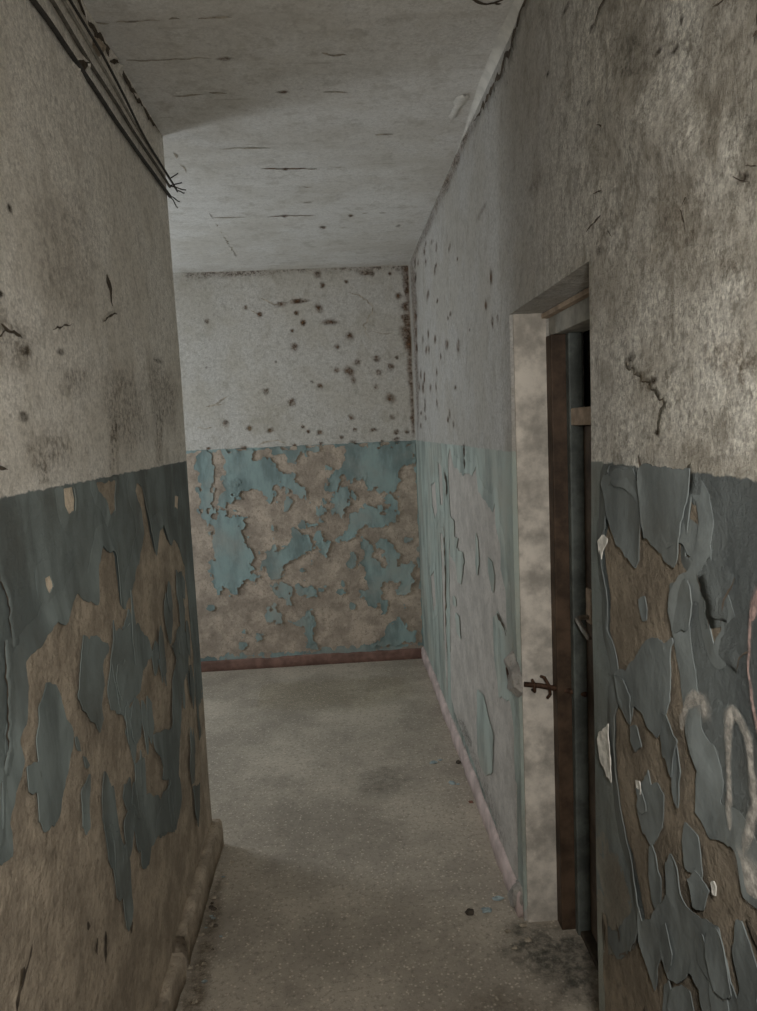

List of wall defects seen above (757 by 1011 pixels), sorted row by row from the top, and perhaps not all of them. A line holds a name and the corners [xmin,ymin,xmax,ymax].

crack [0,308,23,339]
crack [101,269,117,321]
peeling [0,441,422,1011]
peeling [438,445,523,909]
peeling [597,463,757,1011]